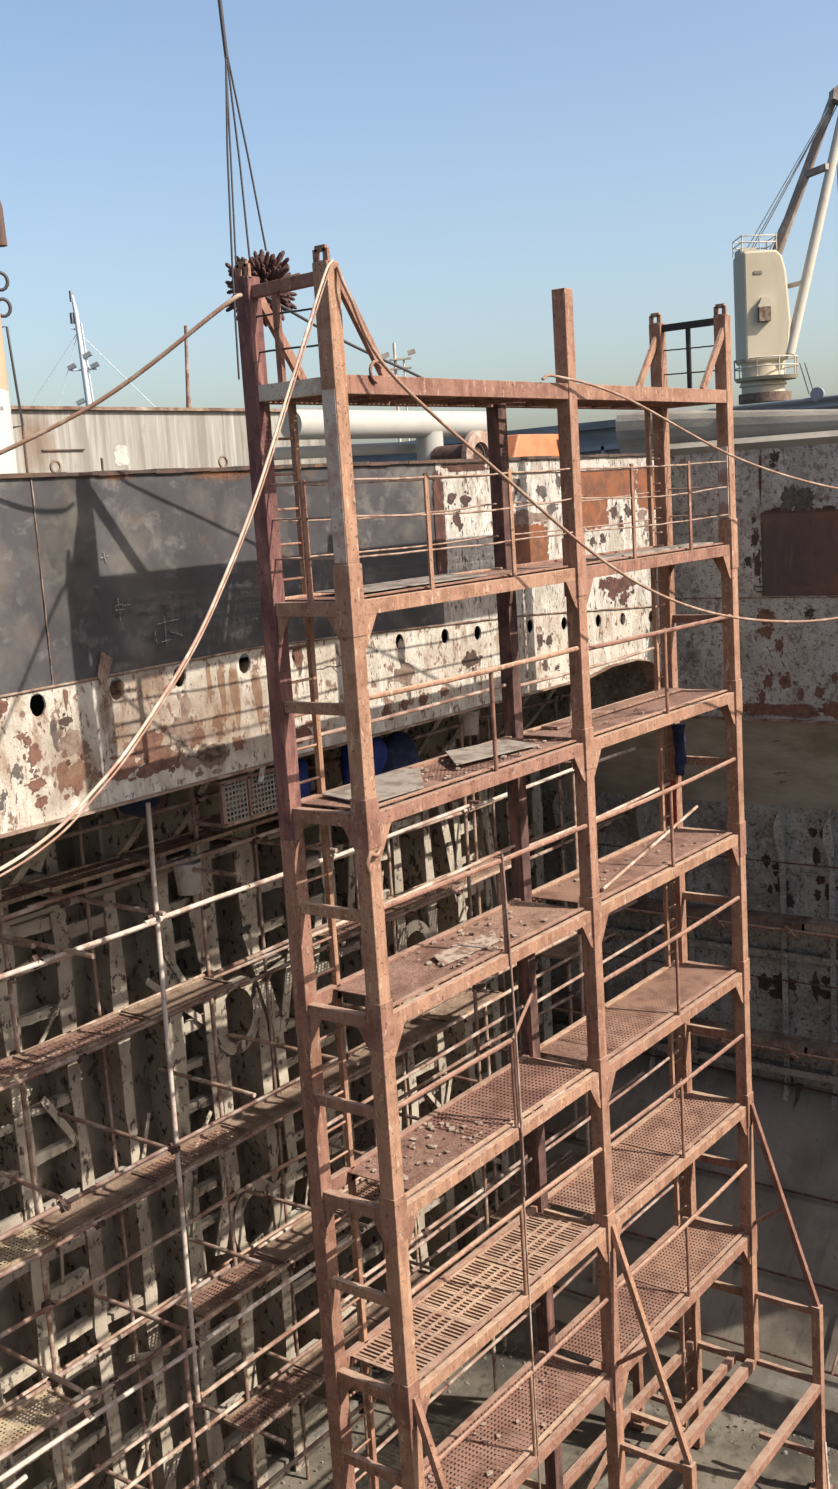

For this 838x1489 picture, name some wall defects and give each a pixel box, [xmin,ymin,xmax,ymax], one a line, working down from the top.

peeling [432,470,472,574]
peeling [588,502,657,547]
peeling [744,450,836,582]
peeling [598,576,636,607]
peeling [462,649,483,671]
peeling [537,633,560,671]
peeling [756,608,838,703]
peeling [382,662,447,720]
peeling [0,690,245,810]